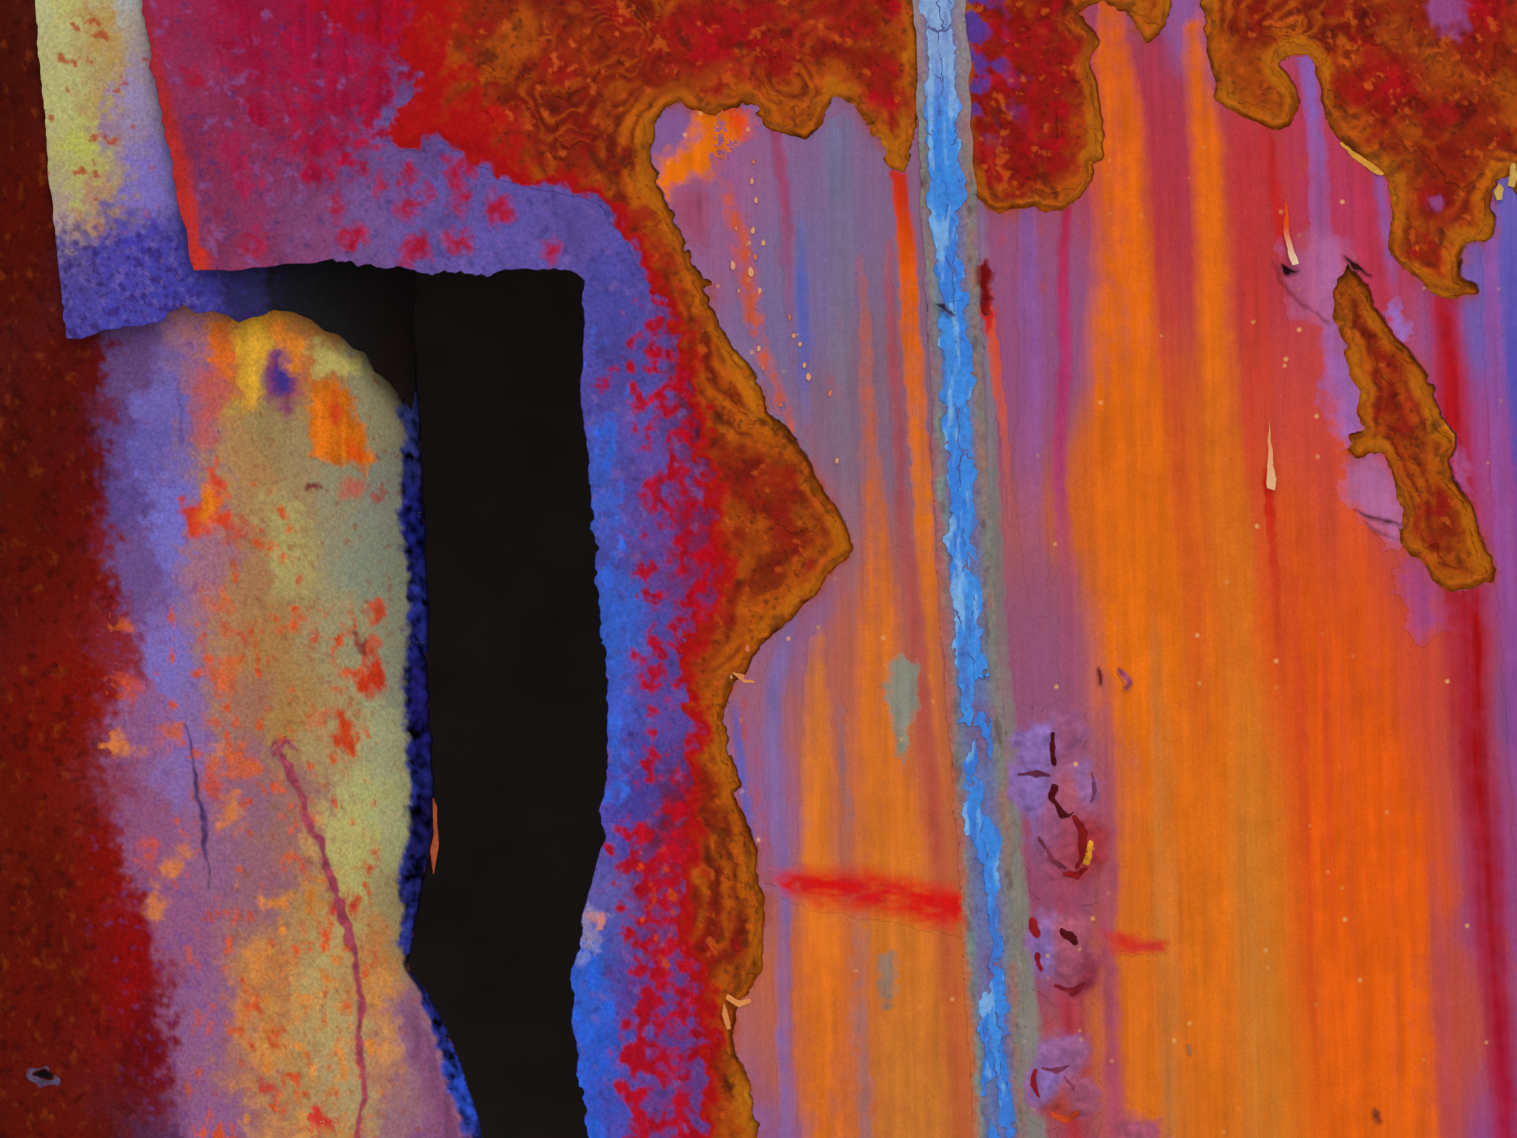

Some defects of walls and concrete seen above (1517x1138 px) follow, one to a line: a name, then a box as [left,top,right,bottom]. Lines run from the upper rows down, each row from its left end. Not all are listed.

peeling [142,0,651,1138]
corrosion [97,0,970,1138]
corrosion [965,0,1517,1138]